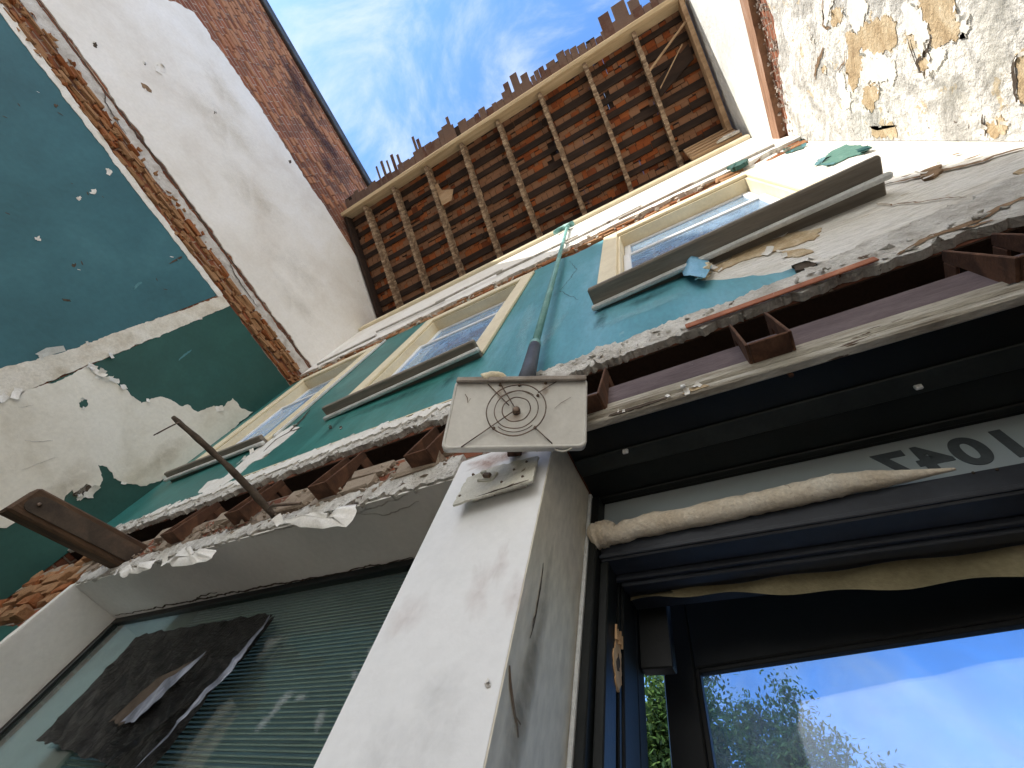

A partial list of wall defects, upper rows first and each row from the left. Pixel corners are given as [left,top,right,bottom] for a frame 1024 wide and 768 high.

flaking render [821,0,971,113]
flaking render [1013,48,1024,105]
flaking render [618,114,1024,281]
peeling [0,296,252,528]
flaking render [273,504,358,529]
flaking render [114,546,216,578]
crack [530,570,543,638]